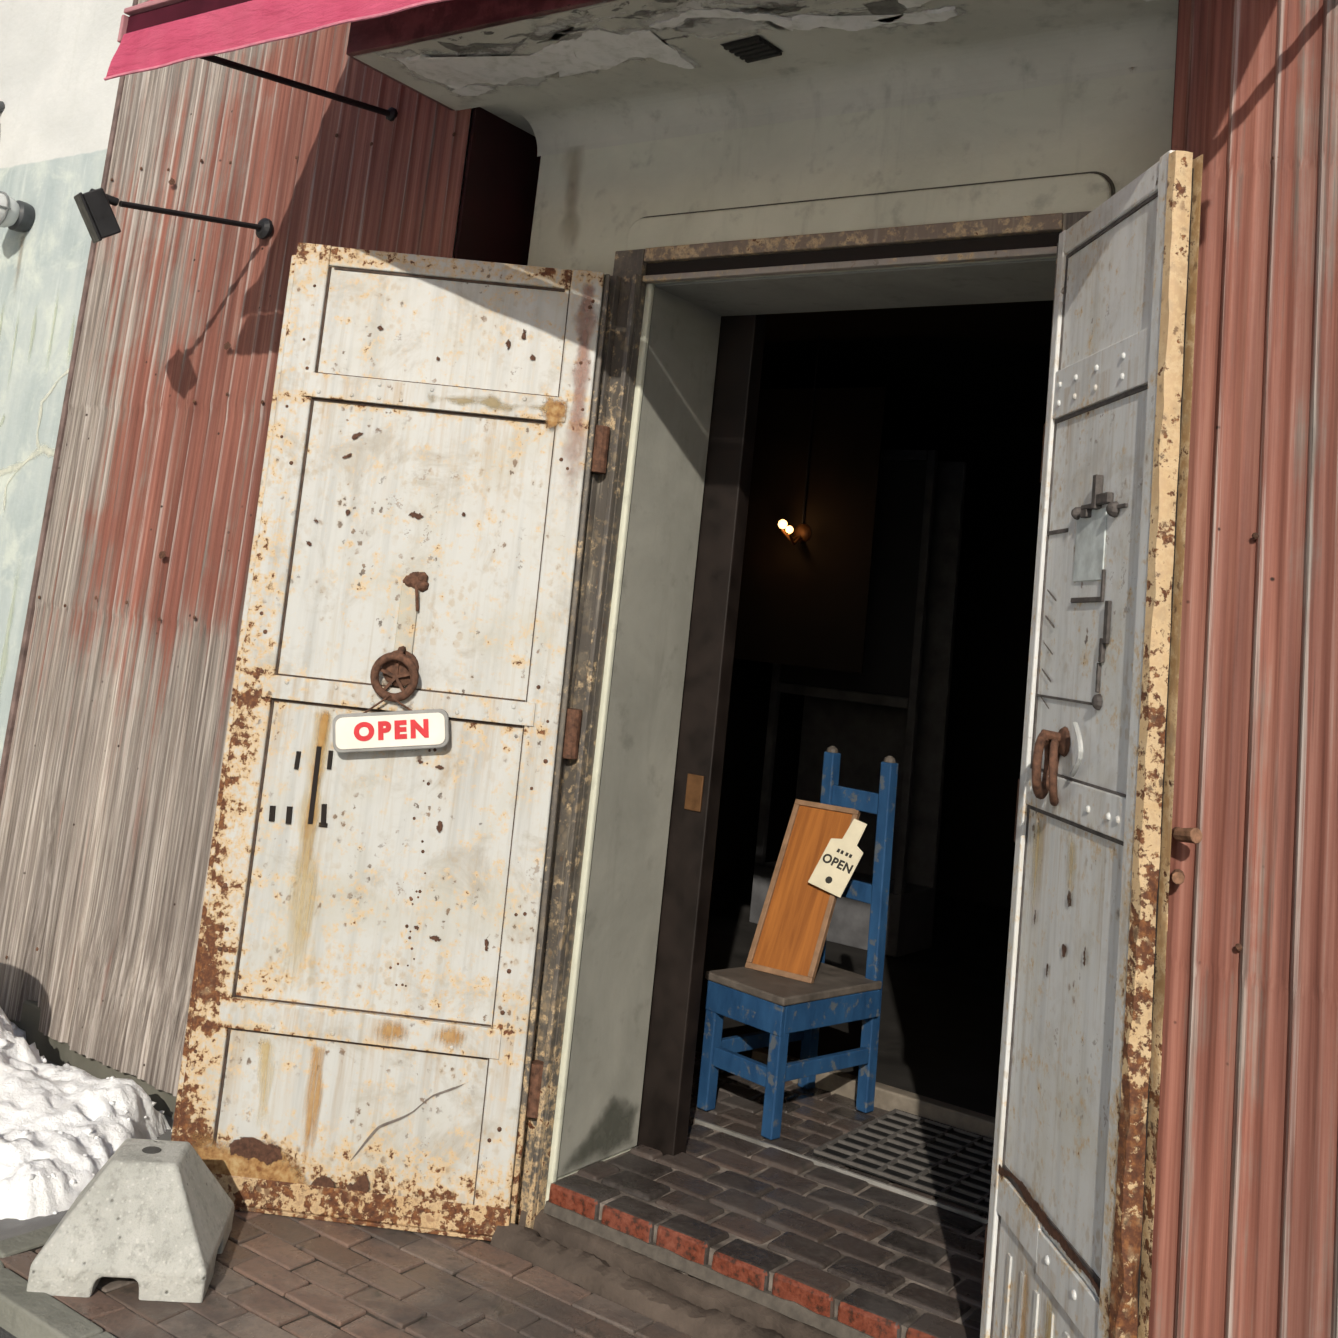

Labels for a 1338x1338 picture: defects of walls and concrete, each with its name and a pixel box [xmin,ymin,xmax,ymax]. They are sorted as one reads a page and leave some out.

peeling [385,0,965,96]
crack [0,369,69,509]
rust [296,713,329,931]
rust [382,1024,403,1037]
rust [440,1029,463,1044]
rust [196,1137,305,1184]
rust [305,1048,321,1143]
crack [350,1084,463,1161]